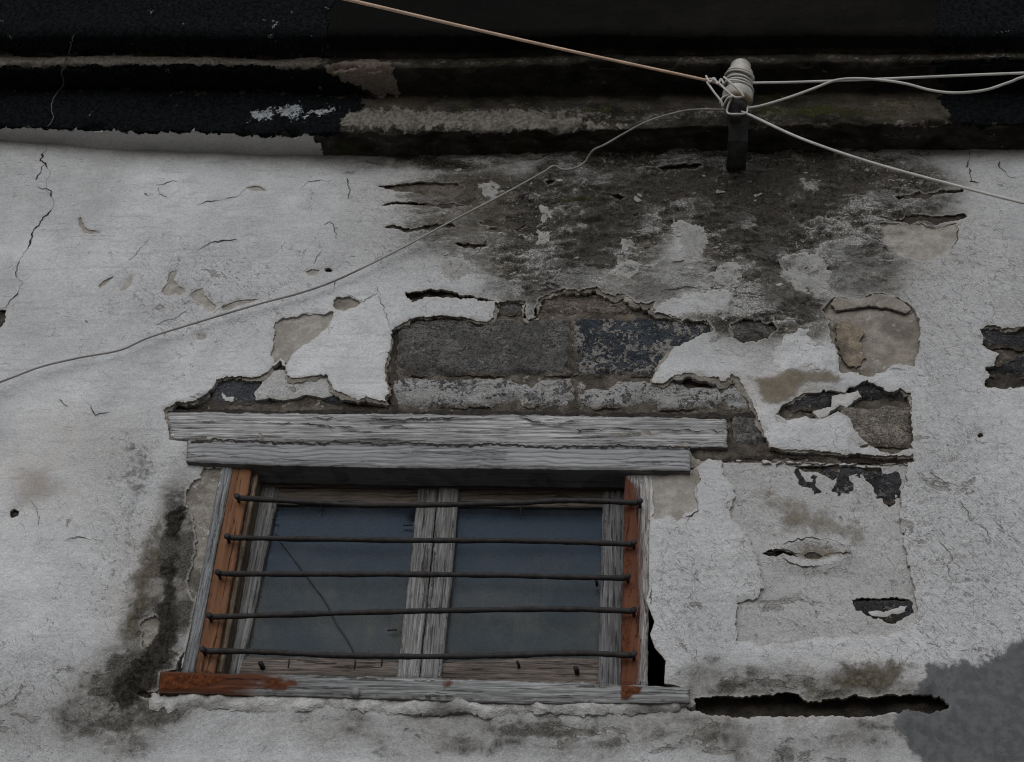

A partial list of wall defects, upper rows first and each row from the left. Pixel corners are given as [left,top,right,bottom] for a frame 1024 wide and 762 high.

crack [5,34,75,308]
peeling [478,180,509,200]
peeling [798,172,823,195]
peeling [480,205,558,244]
peeling [670,219,720,262]
leakage [761,271,814,316]
flaking render [981,326,1024,389]
flaking render [162,238,920,646]
leakage [109,442,187,712]
rust [158,673,226,690]
rust [262,678,296,689]
flaking render [695,692,949,719]